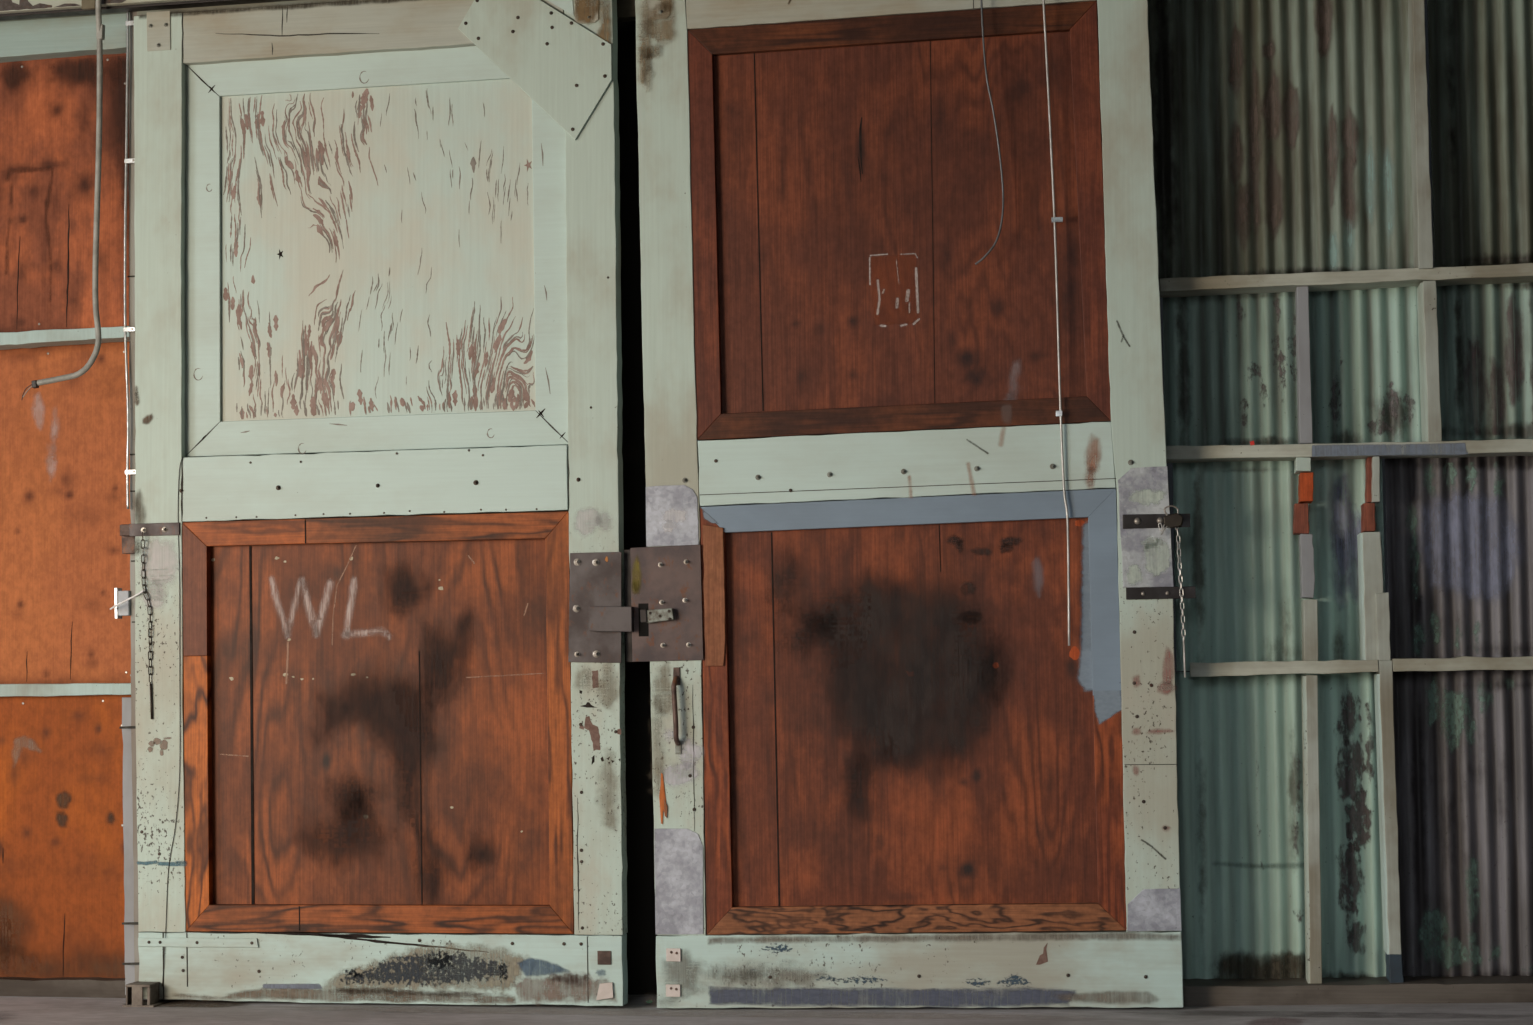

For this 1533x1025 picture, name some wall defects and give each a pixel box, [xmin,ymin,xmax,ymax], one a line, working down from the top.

rust [639,0,673,83]
peeling [223,88,535,419]
rust [1466,298,1533,435]
damp [948,536,1020,555]
damp [325,617,470,831]
damp [794,581,996,810]
peeling [328,944,524,991]